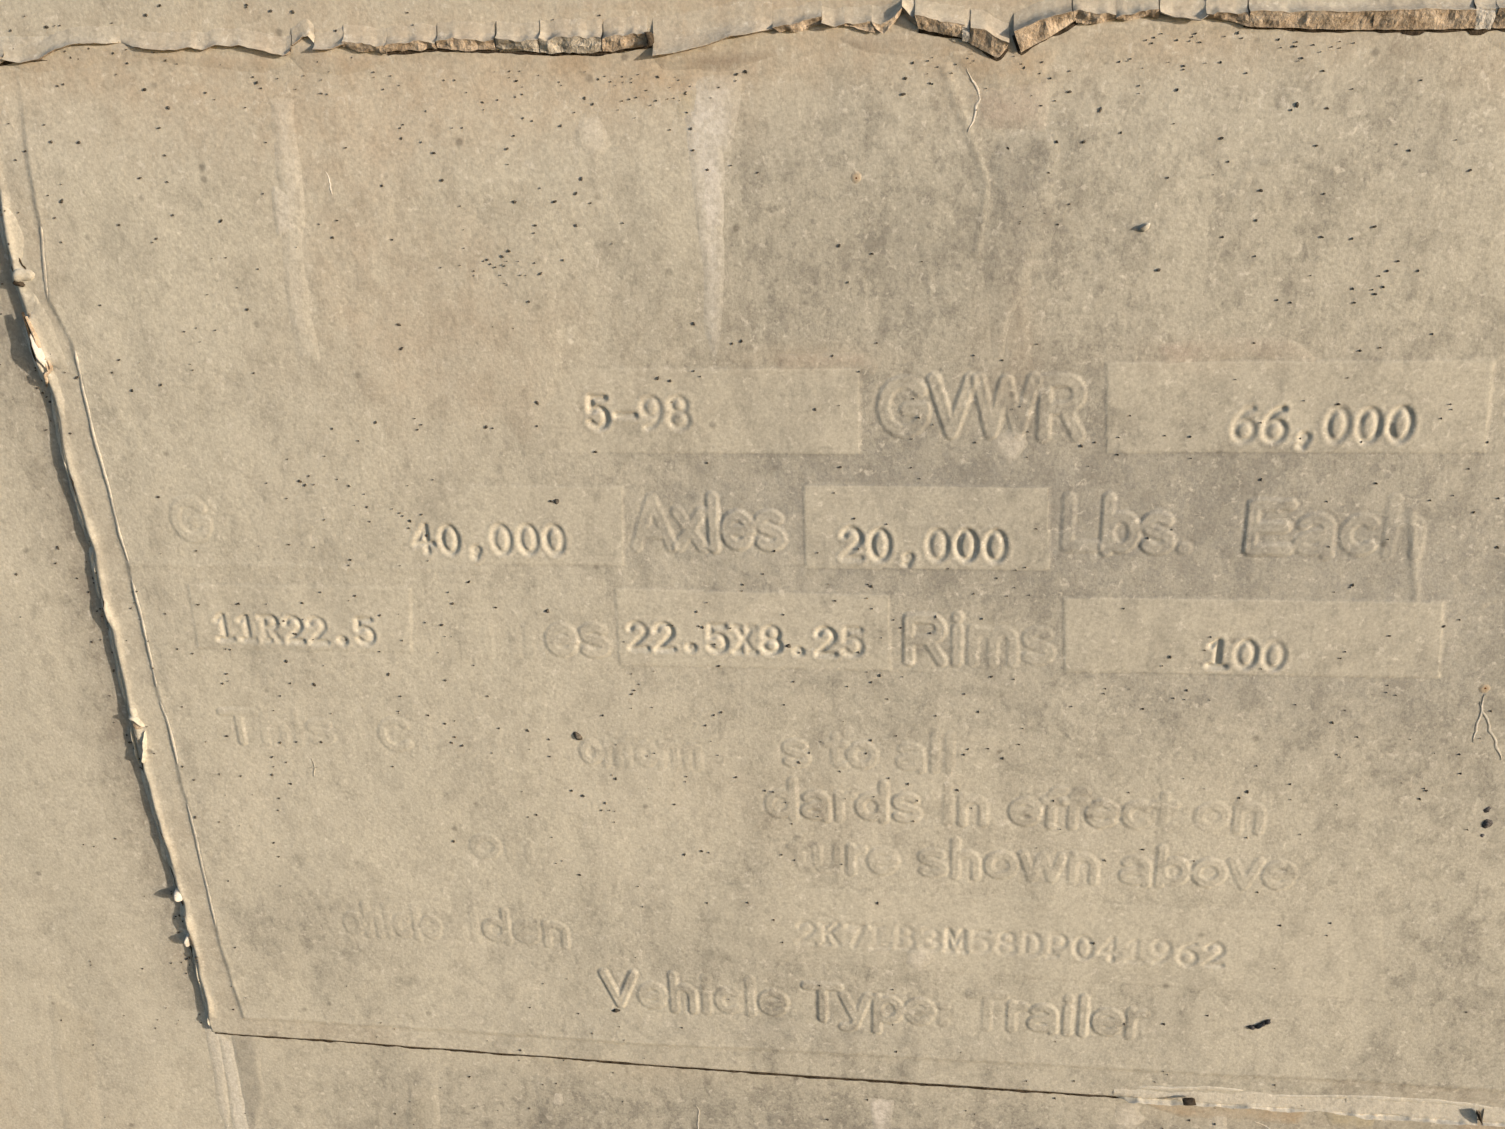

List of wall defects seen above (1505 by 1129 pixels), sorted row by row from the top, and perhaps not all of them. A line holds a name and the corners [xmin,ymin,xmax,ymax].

peeling [0,0,1505,66]
peeling [1113,1086,1505,1127]